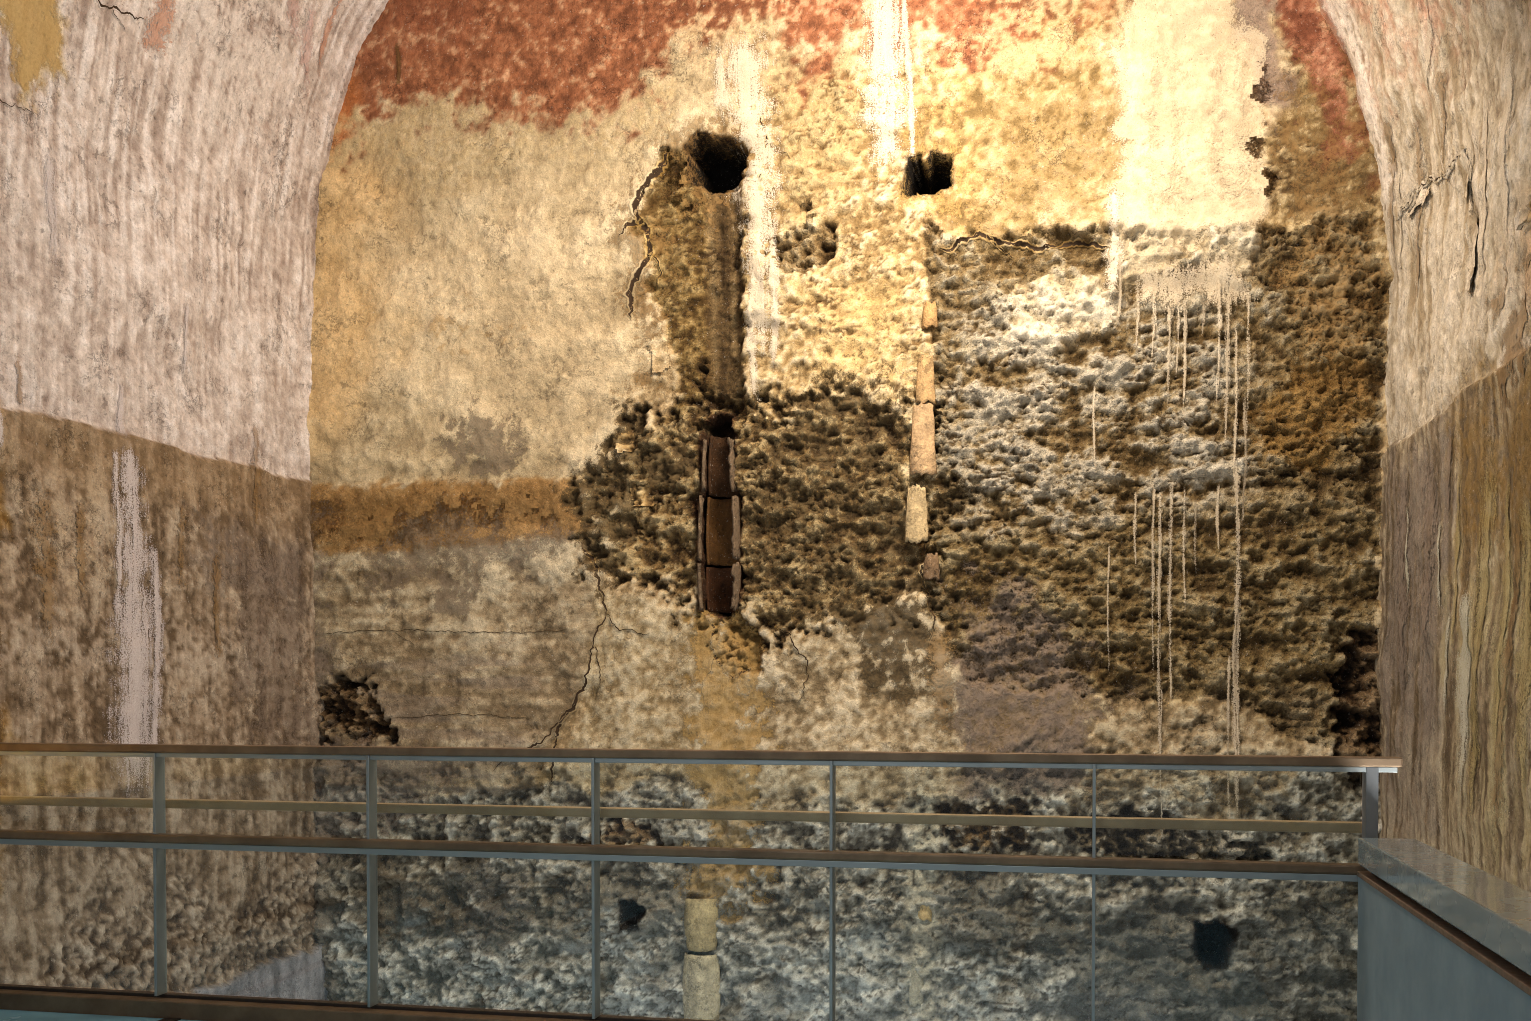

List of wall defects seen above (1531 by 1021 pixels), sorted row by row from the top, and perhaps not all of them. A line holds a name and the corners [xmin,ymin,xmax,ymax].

crack [619,152,670,319]
crack [939,229,1109,259]
damp [1465,42,1516,300]
crack [1516,201,1531,230]
damp [14,355,25,405]
damp [29,488,88,647]
damp [102,384,187,810]
flaking render [318,675,399,746]
crack [318,545,649,786]
damp [211,0,1136,929]
flaking render [562,146,1390,787]
damp [1102,0,1448,837]